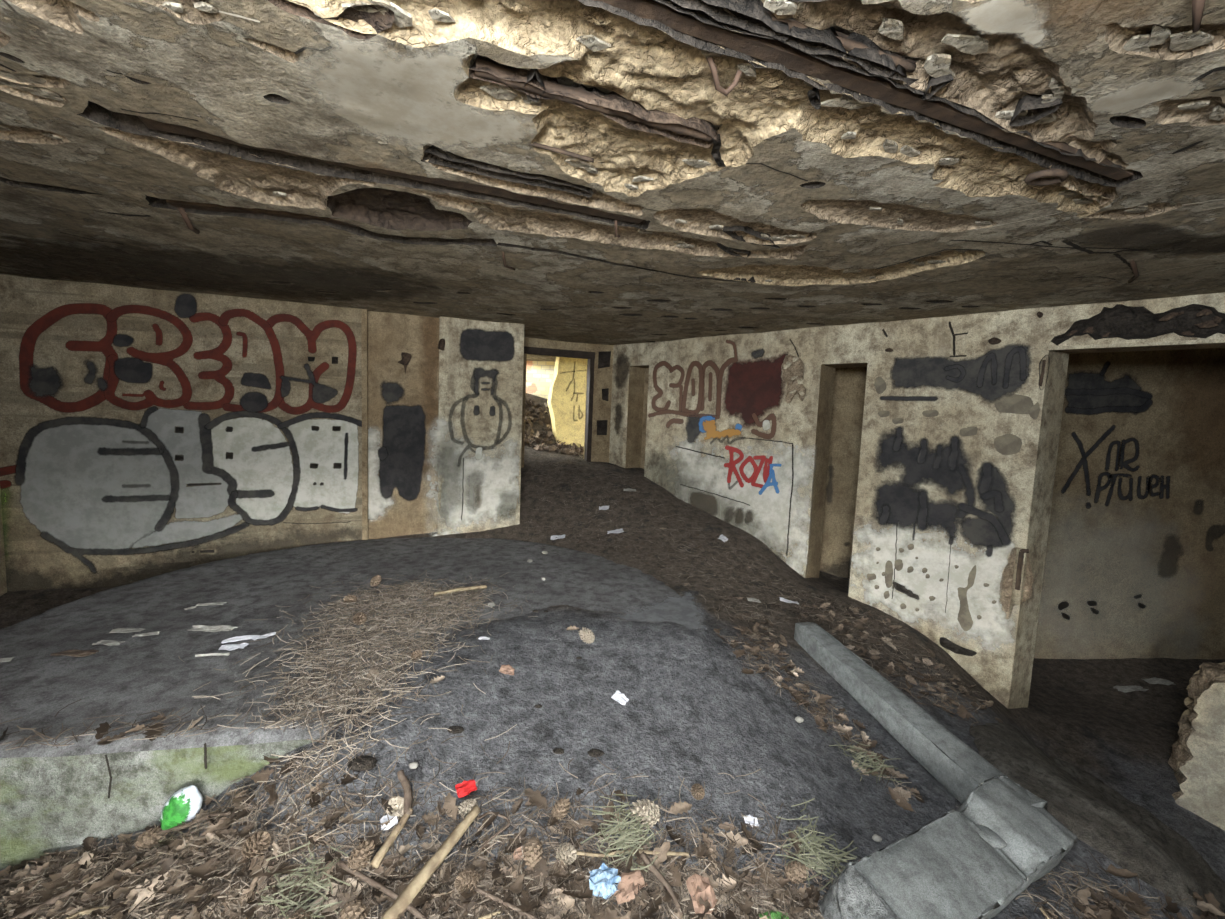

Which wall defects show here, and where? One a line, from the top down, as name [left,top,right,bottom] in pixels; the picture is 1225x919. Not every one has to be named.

spalling [0,0,1225,309]
peeling [1205,525,1225,551]